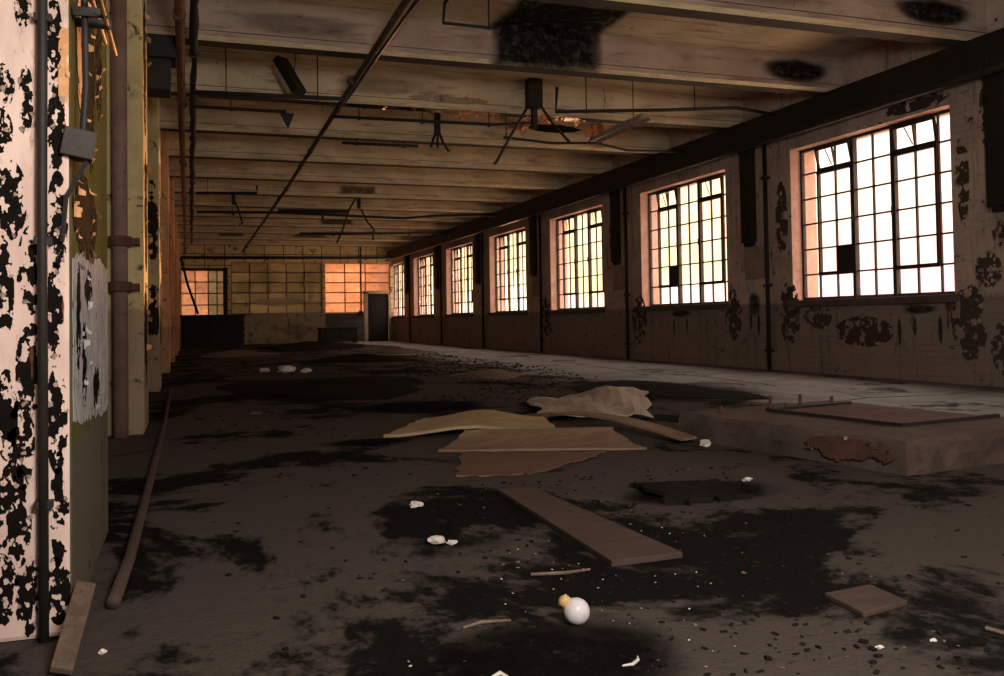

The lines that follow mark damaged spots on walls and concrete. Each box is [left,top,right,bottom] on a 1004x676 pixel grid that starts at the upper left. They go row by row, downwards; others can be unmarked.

peeling [0,0,106,637]
peeling [952,215,1004,375]